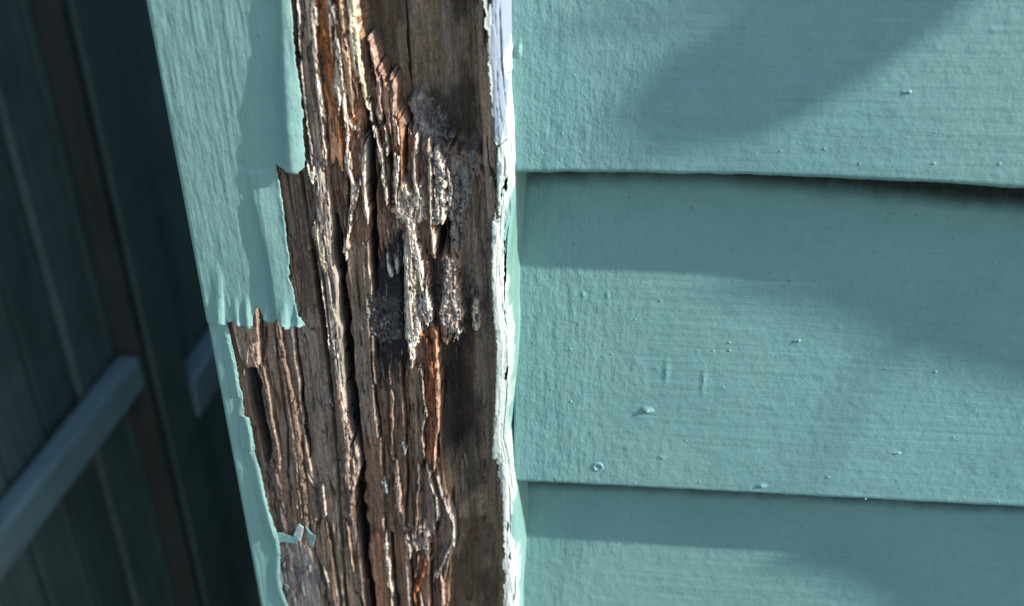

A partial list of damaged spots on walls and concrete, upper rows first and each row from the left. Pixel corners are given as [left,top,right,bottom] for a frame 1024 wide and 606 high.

crack [405,0,413,84]
peeling [232,0,306,330]
crack [367,110,379,252]
peeling [491,0,513,540]
peeling [221,340,239,398]
crack [254,366,272,449]
crack [298,336,311,469]
crack [337,212,379,606]
peeling [238,418,316,547]